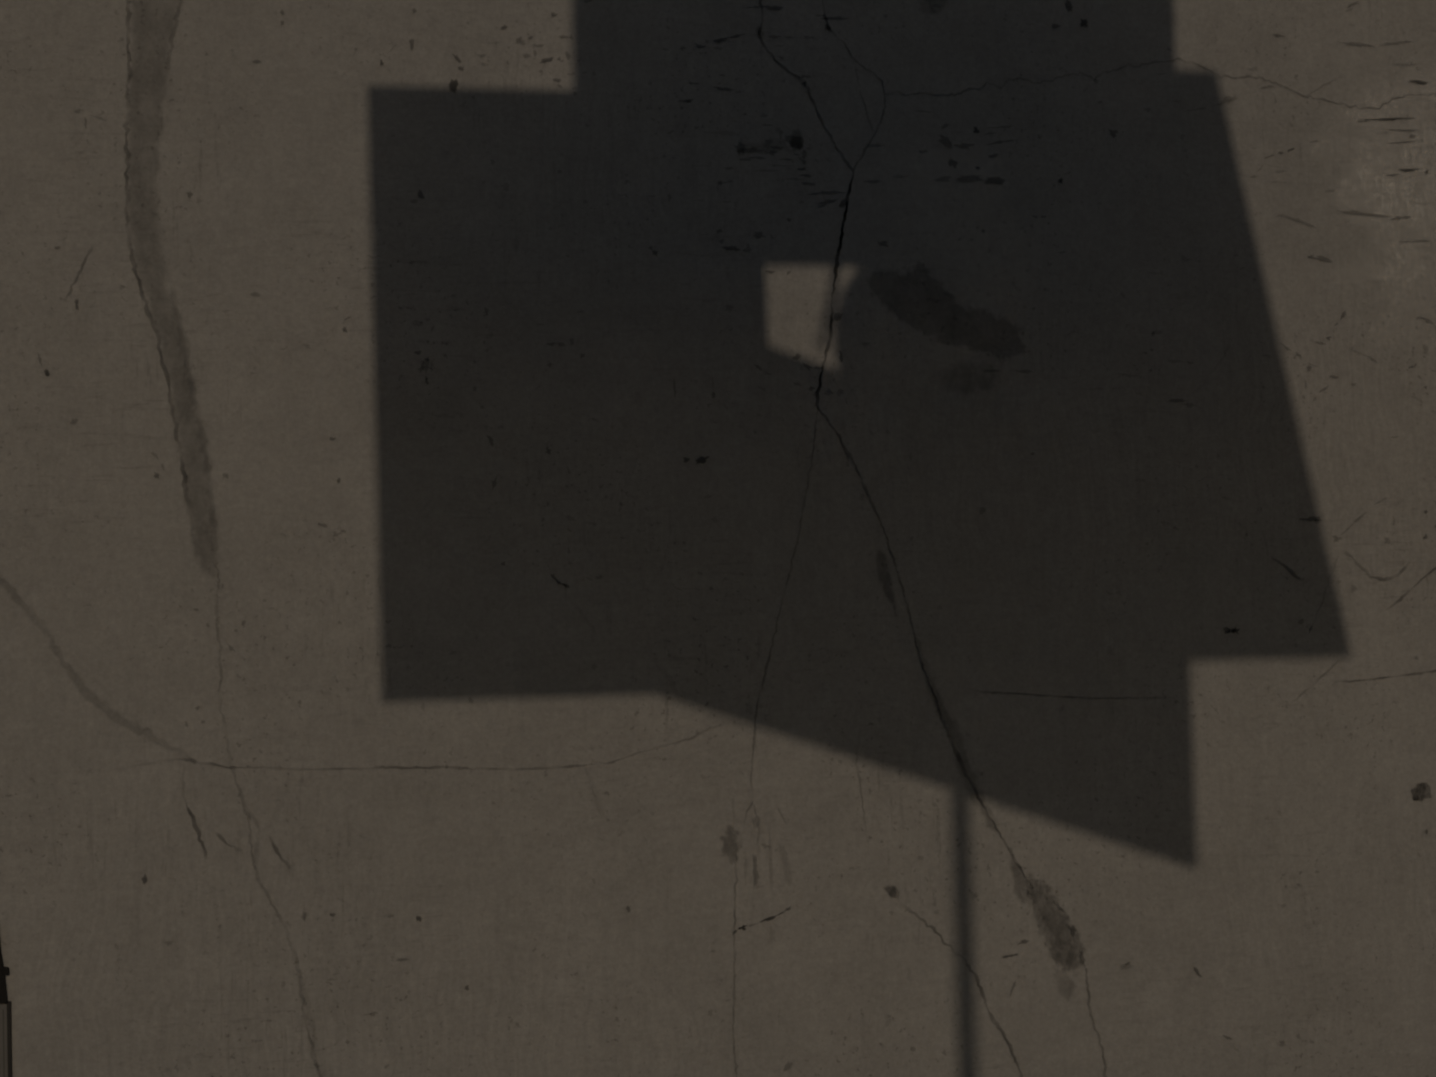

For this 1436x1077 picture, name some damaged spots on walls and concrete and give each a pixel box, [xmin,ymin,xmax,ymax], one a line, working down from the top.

crack [829,180,853,330]